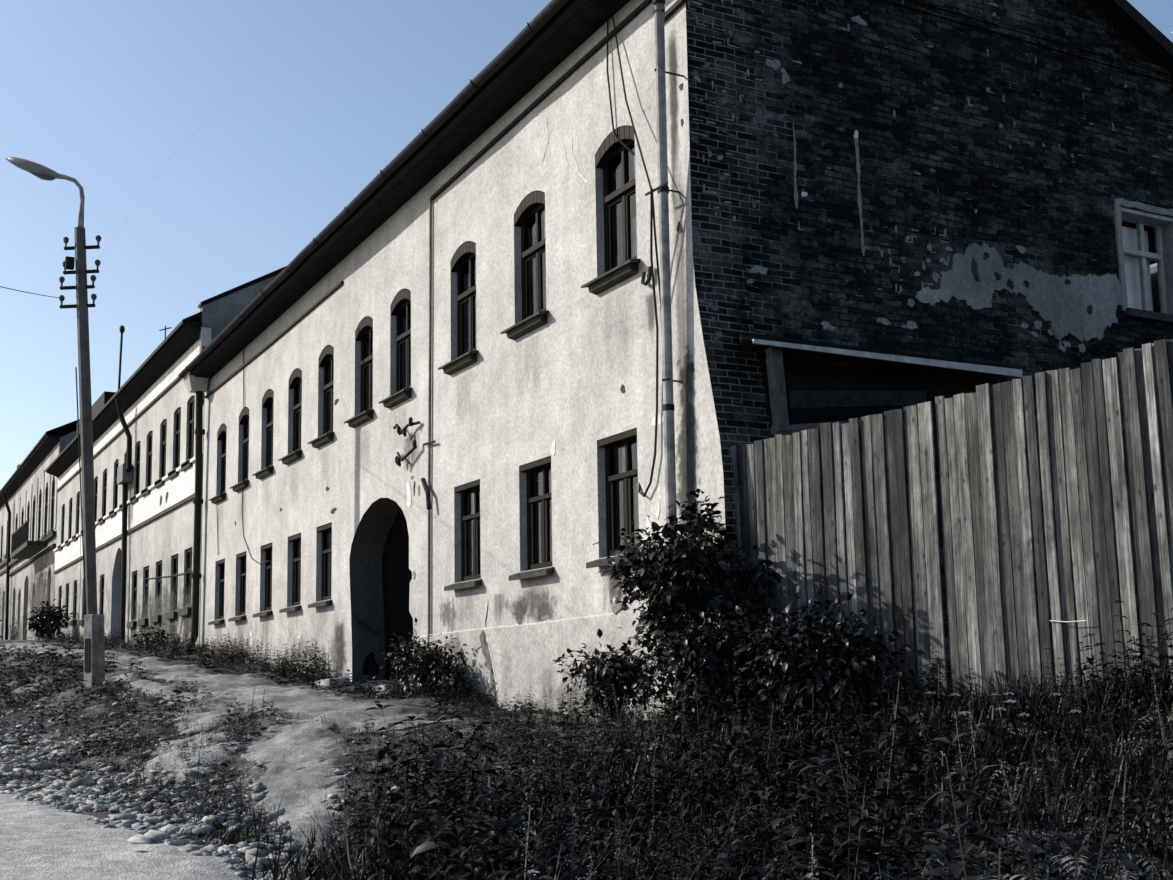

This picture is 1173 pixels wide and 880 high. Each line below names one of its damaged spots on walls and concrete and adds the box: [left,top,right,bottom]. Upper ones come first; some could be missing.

spalling [839,15,867,32]
peeling [679,56,727,103]
spalling [712,30,802,84]
damp [669,39,677,196]
peeling [681,90,744,137]
spalling [747,265,768,284]
peeling [861,225,1123,353]
damp [676,348,701,536]
damp [506,594,550,622]